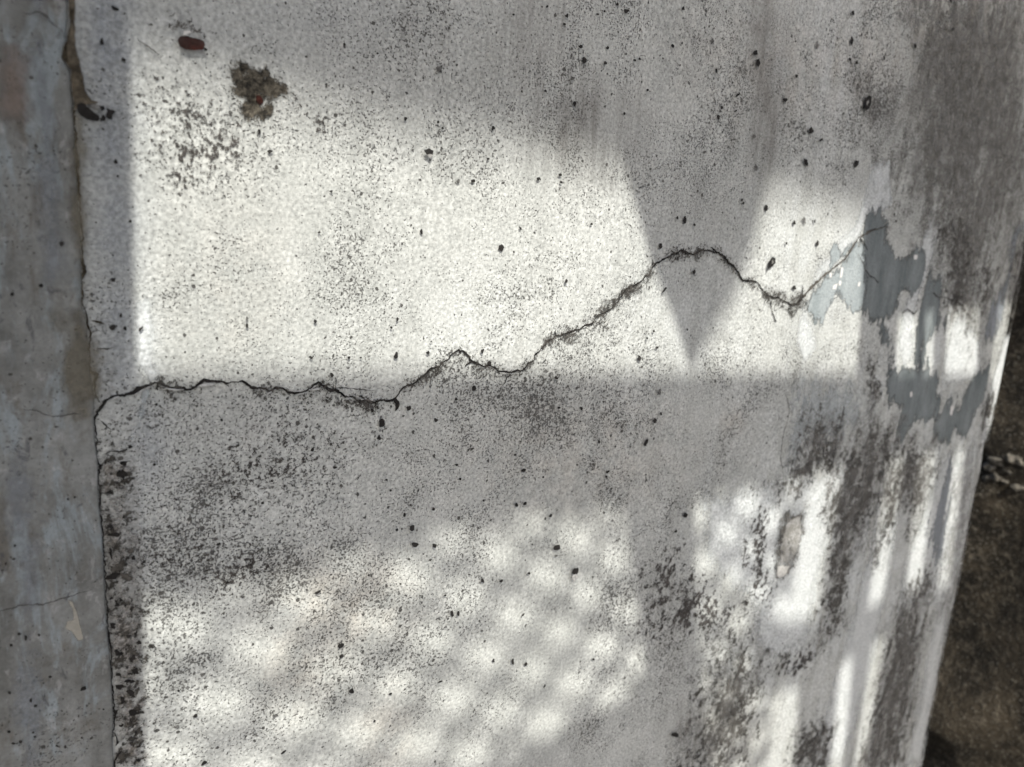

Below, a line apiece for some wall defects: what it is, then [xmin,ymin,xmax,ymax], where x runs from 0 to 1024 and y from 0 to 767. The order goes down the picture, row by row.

crack [73,106,81,196]
crack [1,226,886,767]
leakage [626,0,1024,767]
peeling [802,207,990,570]